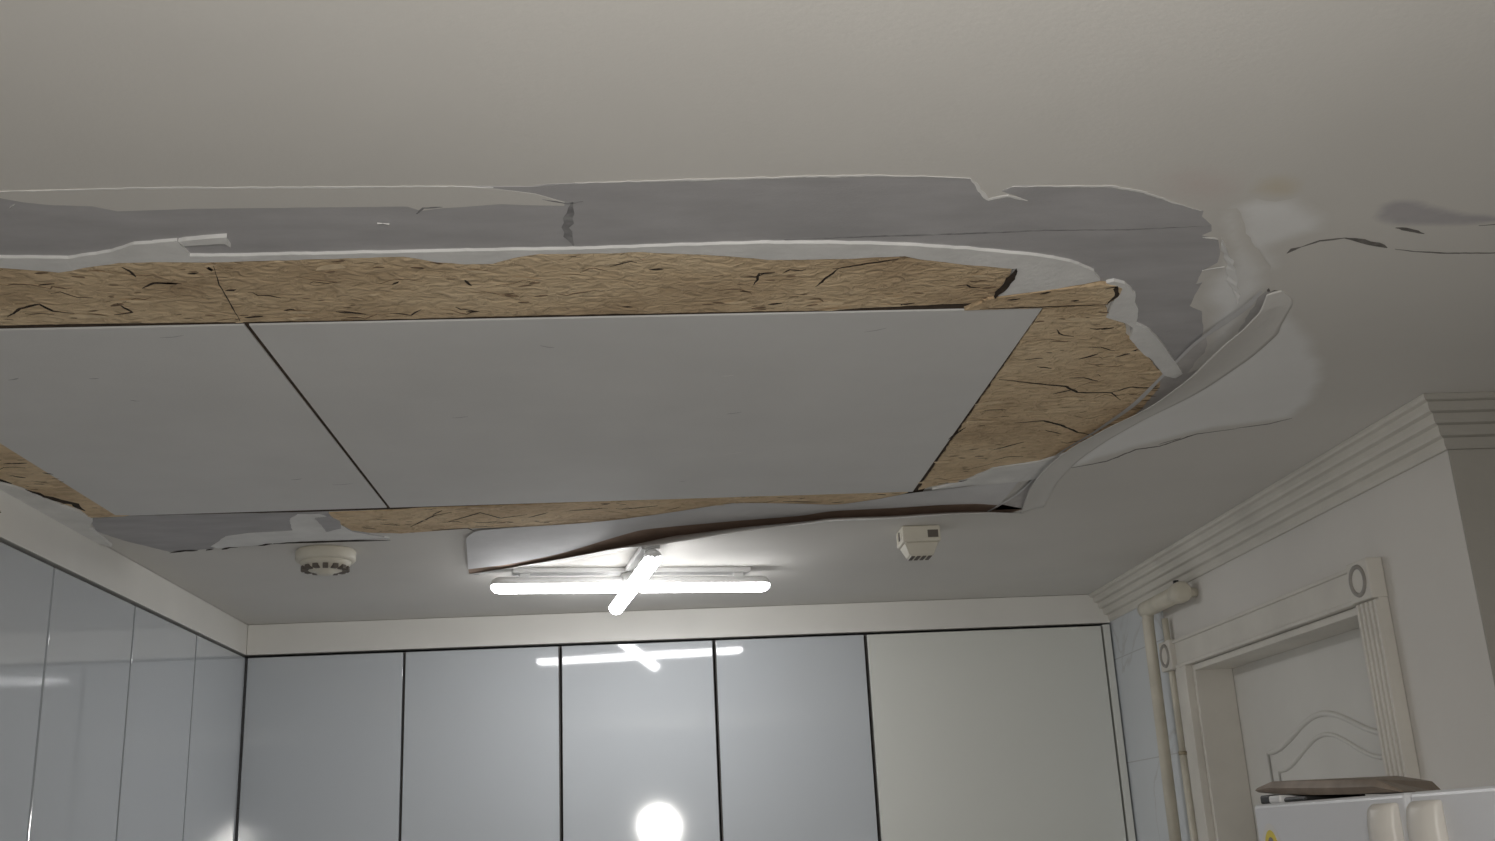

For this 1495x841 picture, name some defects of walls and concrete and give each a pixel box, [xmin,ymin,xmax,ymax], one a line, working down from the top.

peeling [1188,195,1334,373]
crack [1287,224,1495,254]
peeling [1069,307,1329,470]